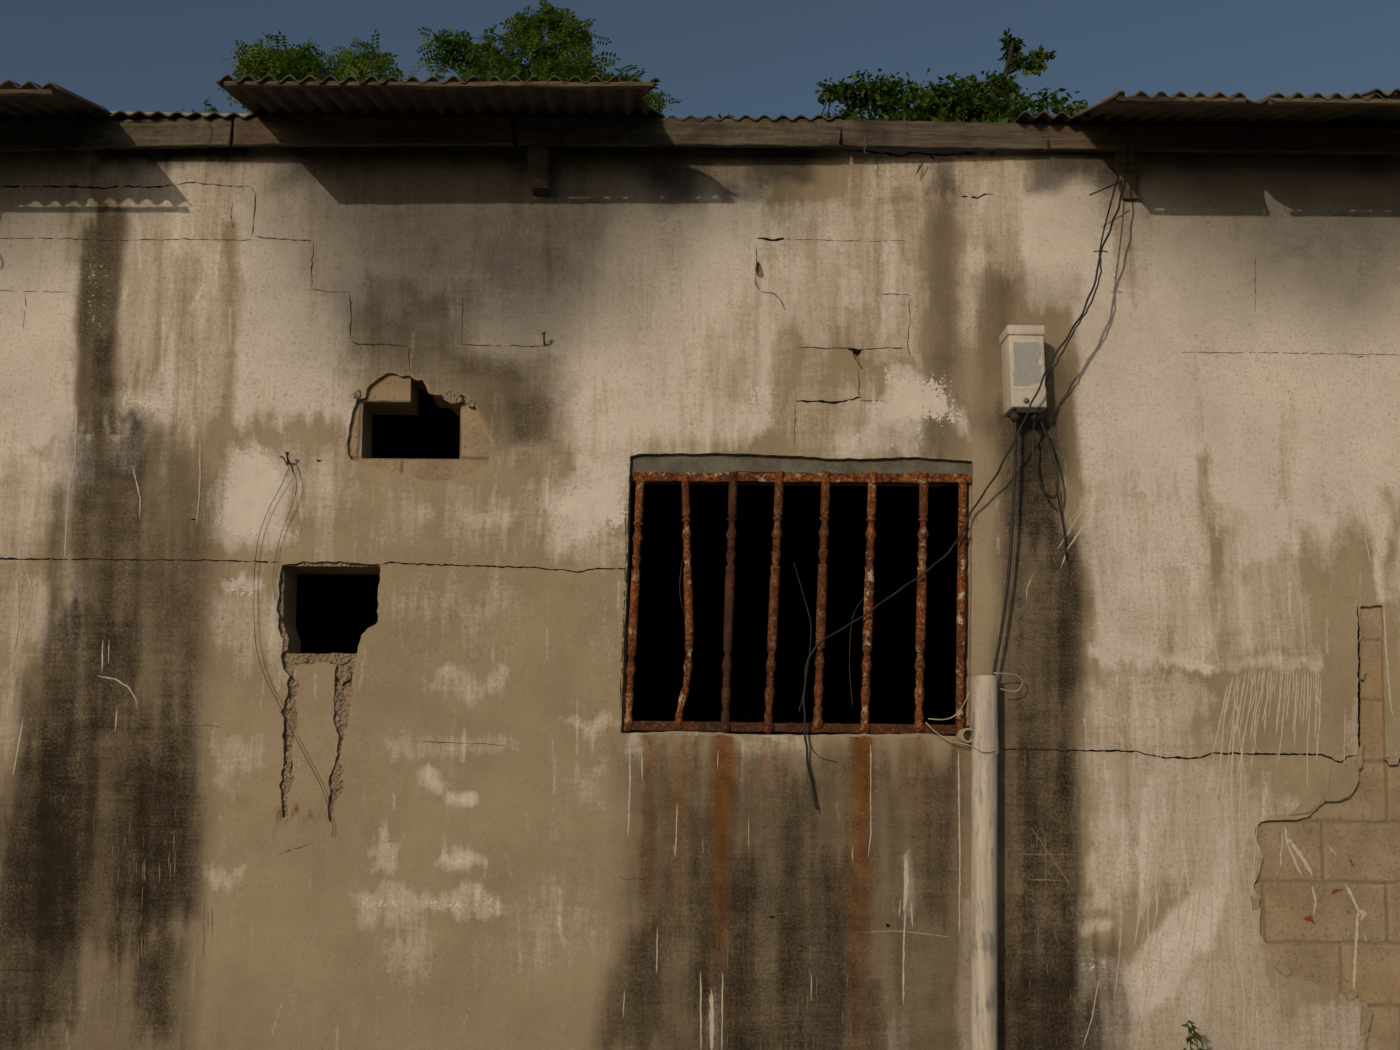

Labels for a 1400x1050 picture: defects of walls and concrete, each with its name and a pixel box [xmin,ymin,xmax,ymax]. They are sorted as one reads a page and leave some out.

damp [0,670,195,1041]
damp [80,202,134,479]
crack [0,556,281,564]
spalling [277,561,380,822]
spalling [348,374,491,481]
damp [998,415,1100,1050]
crack [1003,606,1400,763]
spalling [1250,755,1400,1050]